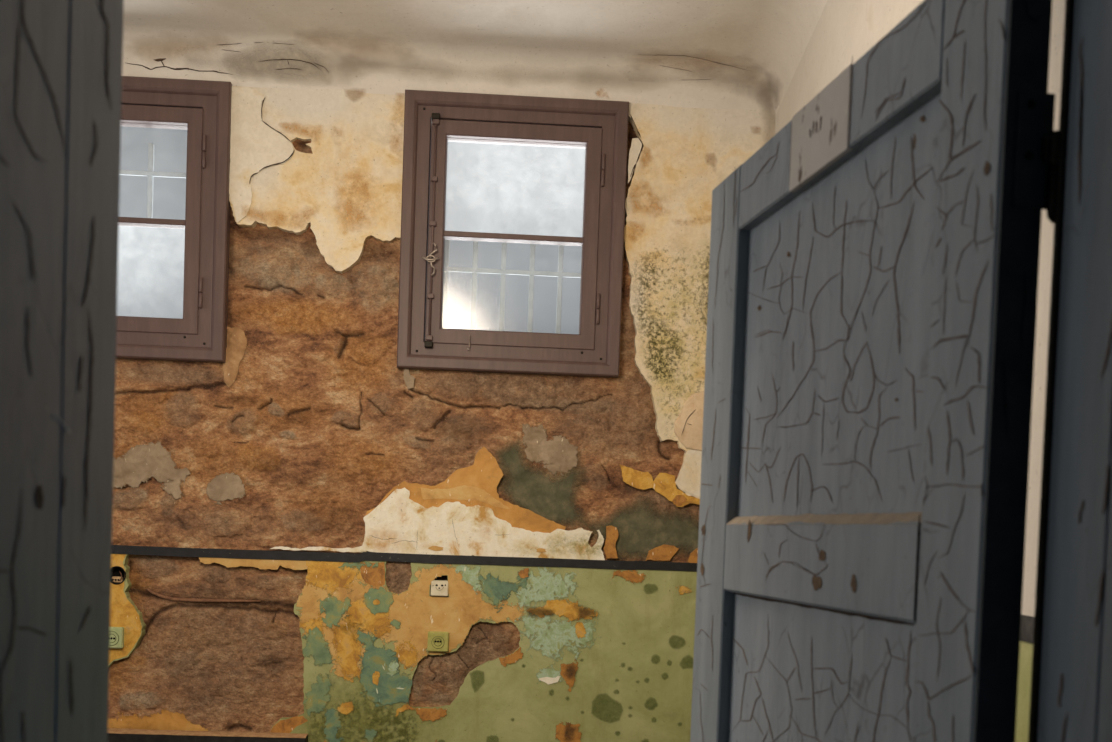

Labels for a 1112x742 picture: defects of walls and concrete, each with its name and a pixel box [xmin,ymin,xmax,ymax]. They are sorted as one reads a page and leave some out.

crack [0,201,95,742]
crack [0,0,233,167]
flaking render [108,86,705,733]
leakage [638,253,710,377]